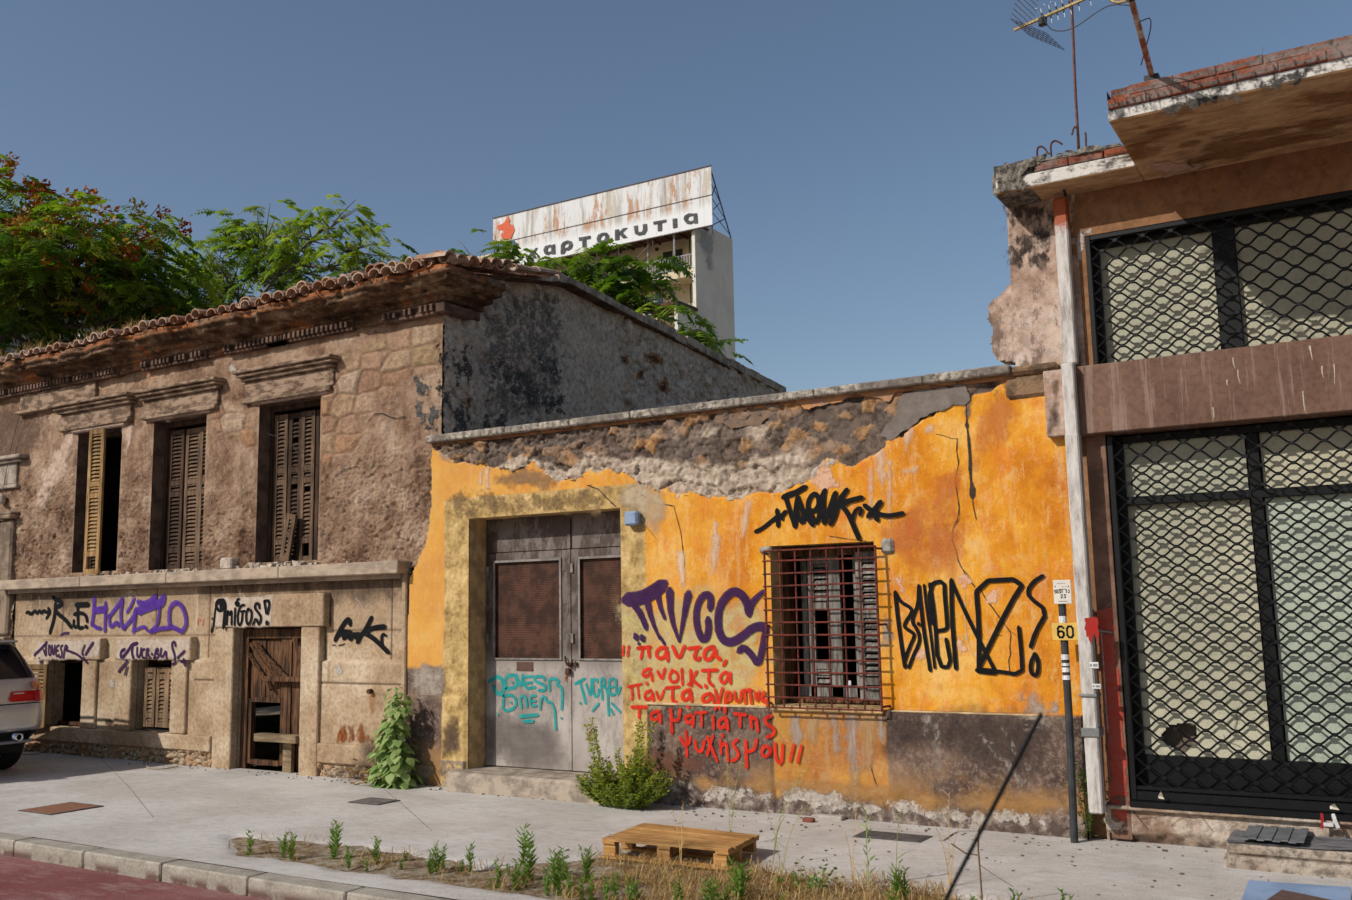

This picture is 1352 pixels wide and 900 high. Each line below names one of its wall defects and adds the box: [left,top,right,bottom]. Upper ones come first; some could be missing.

damp [1110,68,1352,170]
spalling [621,353,669,394]
flaking render [432,380,1005,530]
crack [937,396,1015,677]
damp [791,713,1046,800]